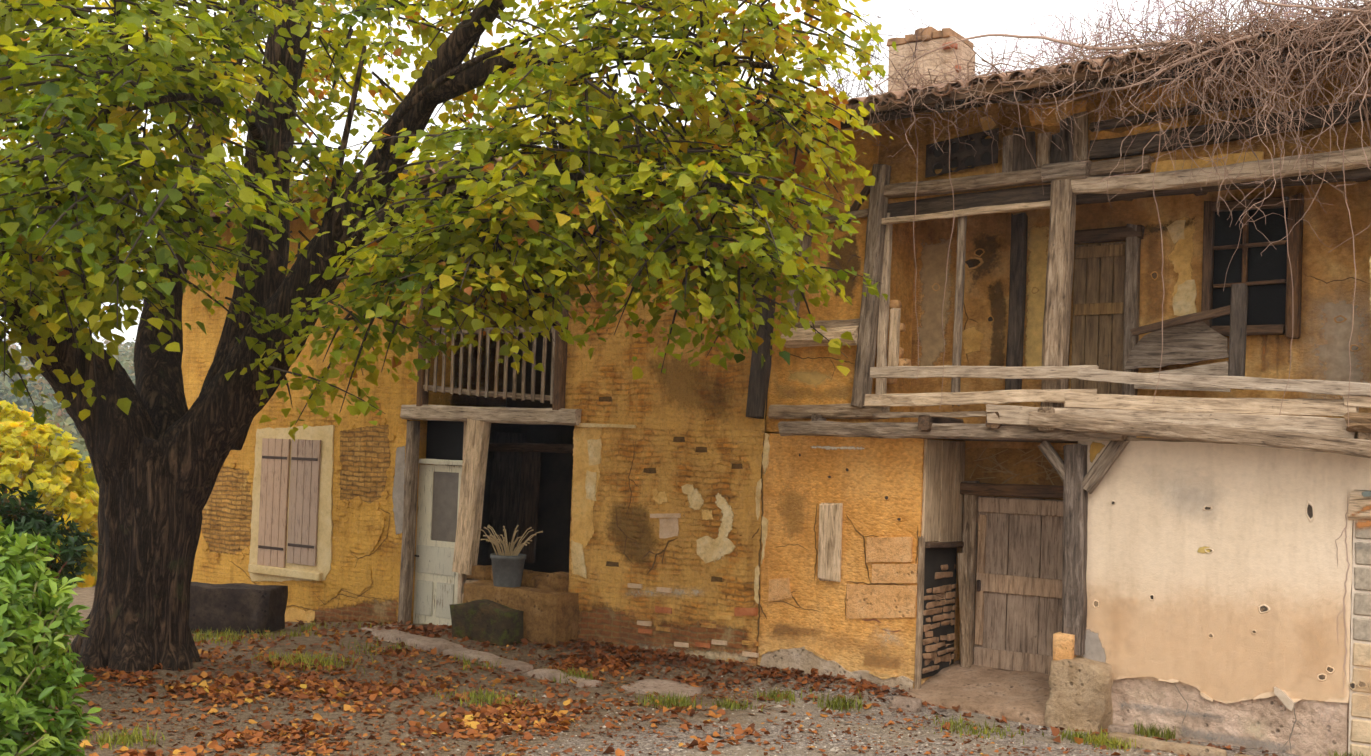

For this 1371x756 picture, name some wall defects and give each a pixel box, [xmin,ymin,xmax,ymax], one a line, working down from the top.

peeling [1151,217,1197,316]
spalling [577,583,781,658]
peeling [696,534,736,582]
crack [1335,499,1350,695]
spalling [1317,665,1335,681]
flaking render [1111,677,1368,756]